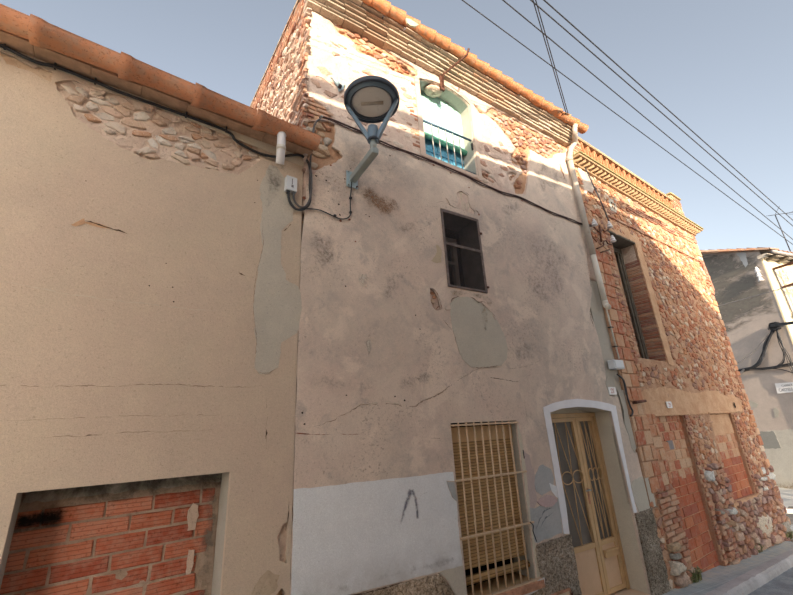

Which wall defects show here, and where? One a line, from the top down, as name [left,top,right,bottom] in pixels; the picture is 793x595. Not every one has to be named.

spalling [333,24,417,78]
spalling [0,53,260,175]
spalling [306,97,342,170]
spalling [476,108,566,194]
spalling [71,218,127,234]
spalling [430,288,442,311]
crack [0,381,240,389]
crack [297,366,518,435]
damp [28,473,222,499]